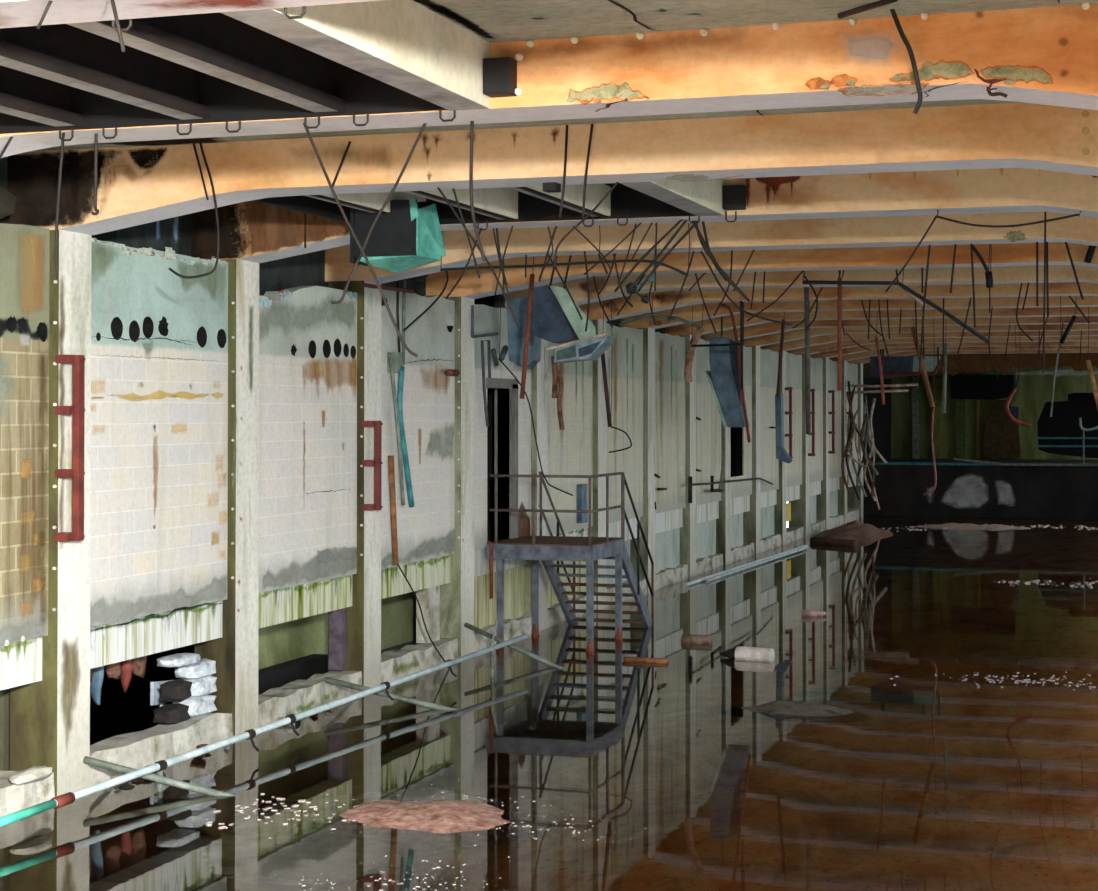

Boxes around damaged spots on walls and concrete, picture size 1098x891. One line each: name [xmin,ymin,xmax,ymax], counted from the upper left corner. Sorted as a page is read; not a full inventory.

crack [608,0,662,31]
spalling [566,81,649,105]
spalling [838,59,1053,98]
corrosion [746,176,800,204]
leakage [7,137,221,309]
spalling [92,214,229,265]
spalling [259,250,328,308]
spalling [381,275,426,307]
corrosion [309,362,331,386]
leakage [263,548,357,605]
leakage [90,577,227,651]
leakage [63,643,78,729]